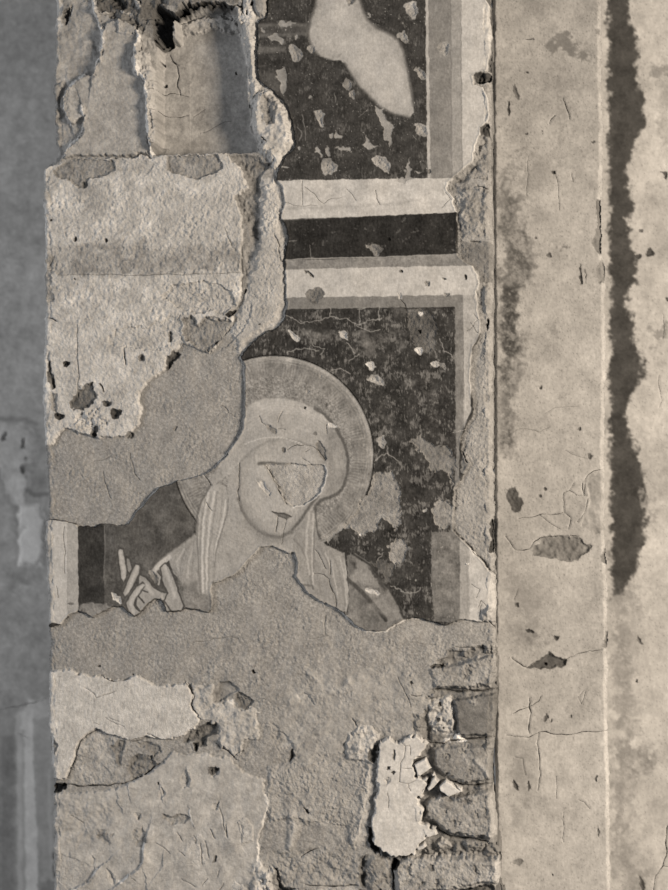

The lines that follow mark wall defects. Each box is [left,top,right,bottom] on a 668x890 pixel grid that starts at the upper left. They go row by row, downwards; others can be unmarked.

spalling [95,0,242,53]
flaking render [52,153,289,244]
flaking render [107,280,247,370]
flaking render [69,382,109,441]
crack [506,452,601,551]
flaking render [532,470,604,563]
damp [638,487,663,533]
crack [54,730,152,787]
flaking render [54,728,162,793]
spalling [183,721,218,747]
flaking render [414,757,481,850]
spalling [368,827,380,853]